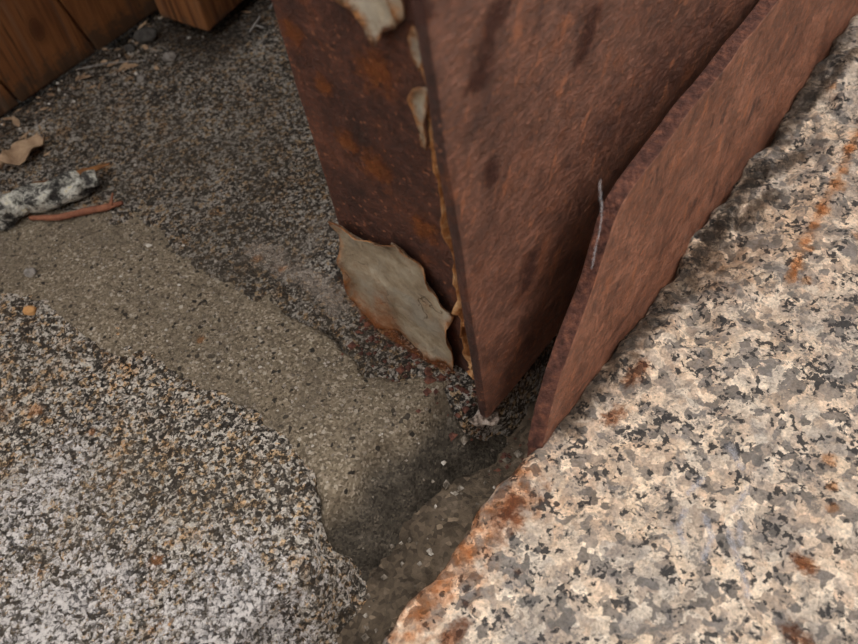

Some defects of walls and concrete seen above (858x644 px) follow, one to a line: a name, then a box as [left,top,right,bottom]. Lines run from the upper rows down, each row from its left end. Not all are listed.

peeling [334,0,421,71]
peeling [407,87,429,151]
corrosion [413,101,474,380]
peeling [328,221,454,372]
corrosion [620,359,653,387]
corrosion [600,405,627,426]
corrosion [491,494,524,530]
corrosion [442,618,472,644]